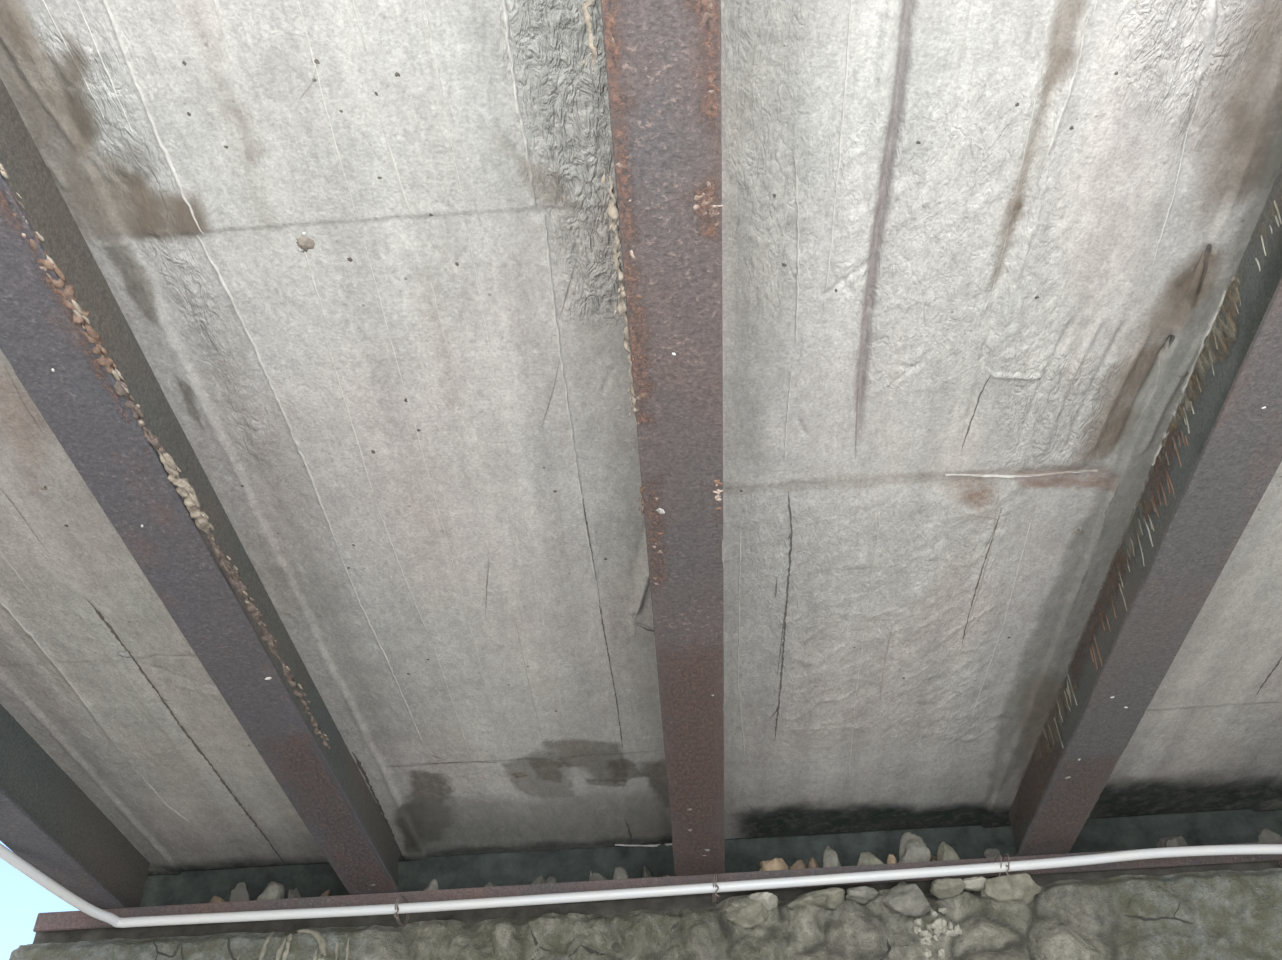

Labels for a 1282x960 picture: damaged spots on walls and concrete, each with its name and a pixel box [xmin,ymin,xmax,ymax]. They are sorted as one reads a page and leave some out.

corrosion [602,0,654,423]
leakage [1151,276,1241,474]
crack [86,598,285,863]
leakage [399,773,672,862]
crack [772,493,793,738]
crack [1256,657,1282,695]